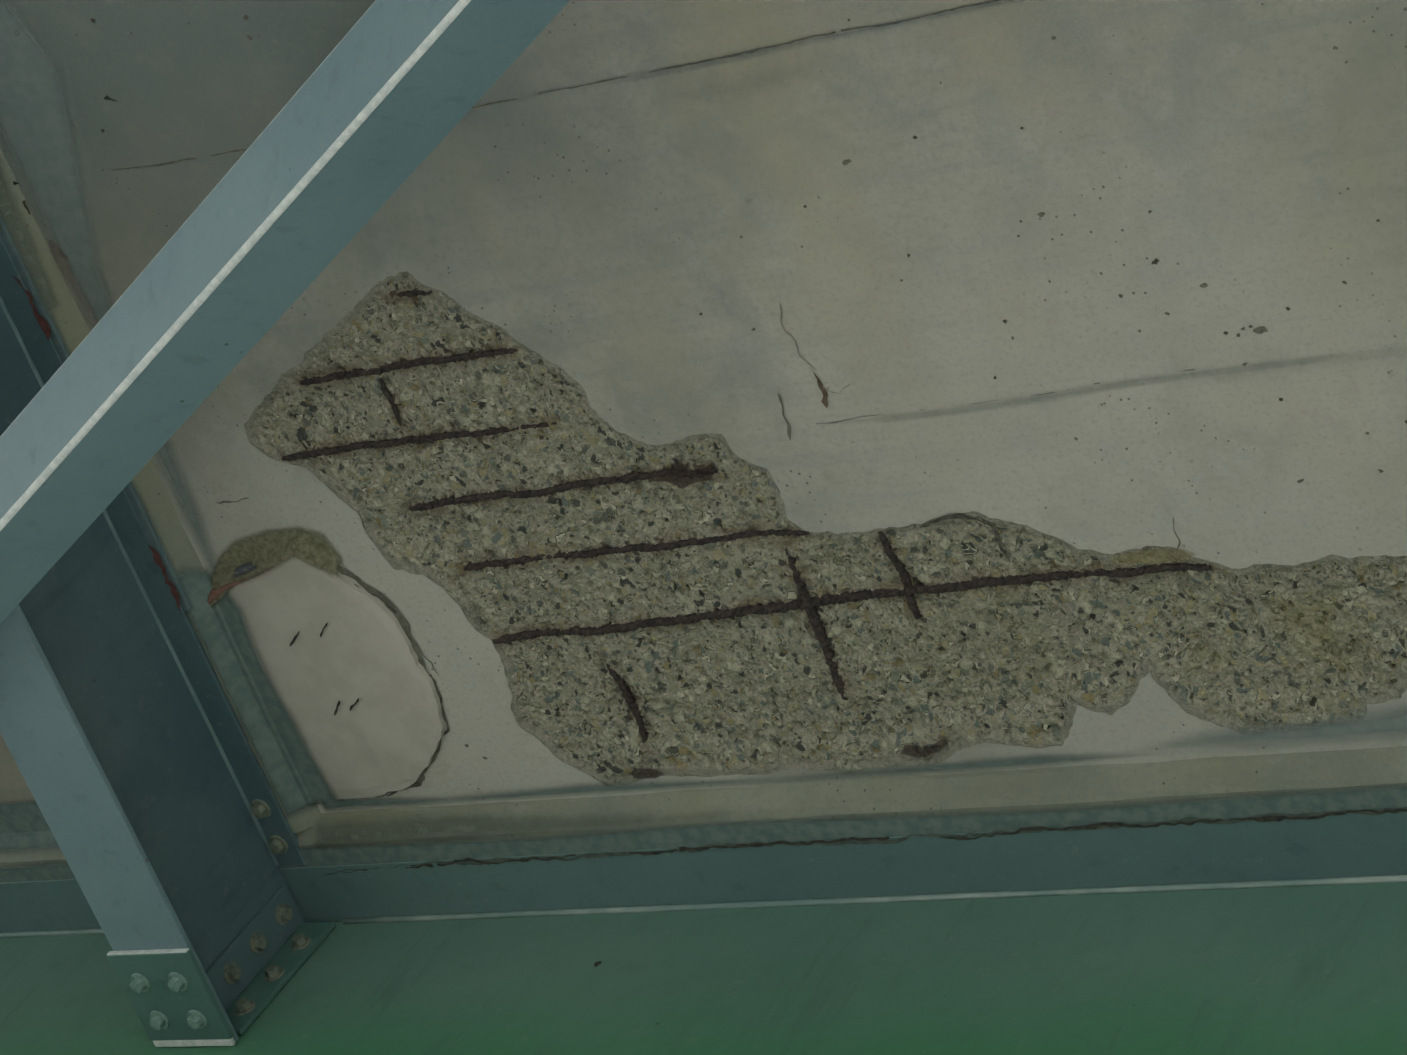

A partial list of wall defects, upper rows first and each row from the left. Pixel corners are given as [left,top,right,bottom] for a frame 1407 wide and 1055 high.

crack [471,0,1011,109]
crack [115,149,247,170]
crack [757,303,880,440]
corrosion [649,460,712,489]
spalling [244,271,1407,785]
crack [322,807,1407,876]